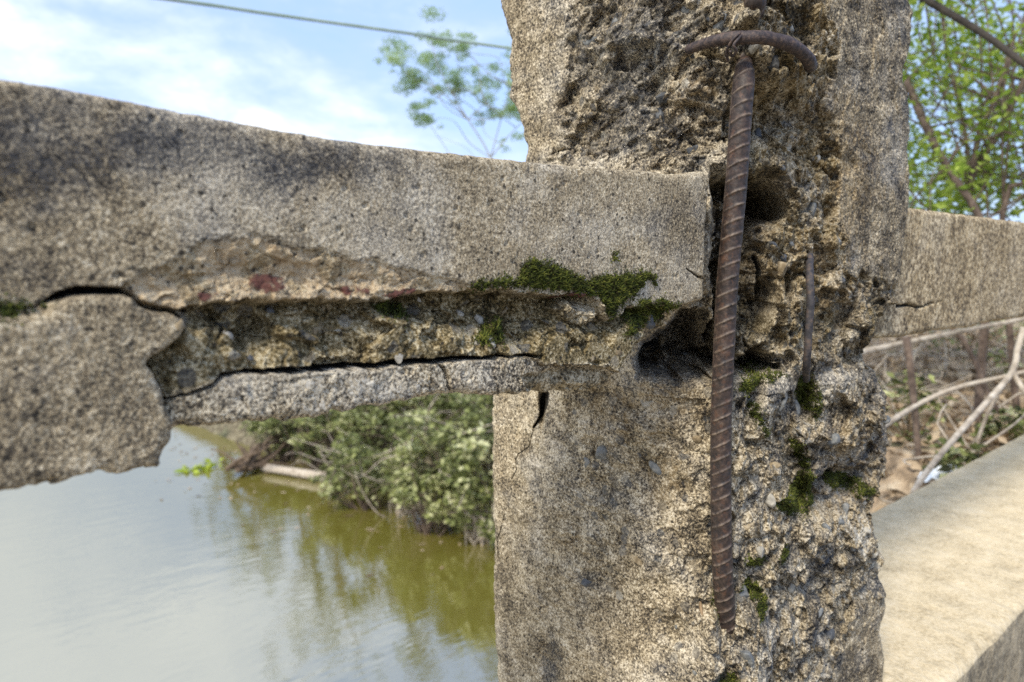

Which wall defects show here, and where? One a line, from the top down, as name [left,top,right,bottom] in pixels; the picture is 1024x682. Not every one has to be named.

crack [16,286,122,310]
crack [173,353,536,397]
spalling [117,0,899,682]
crack [514,391,549,474]